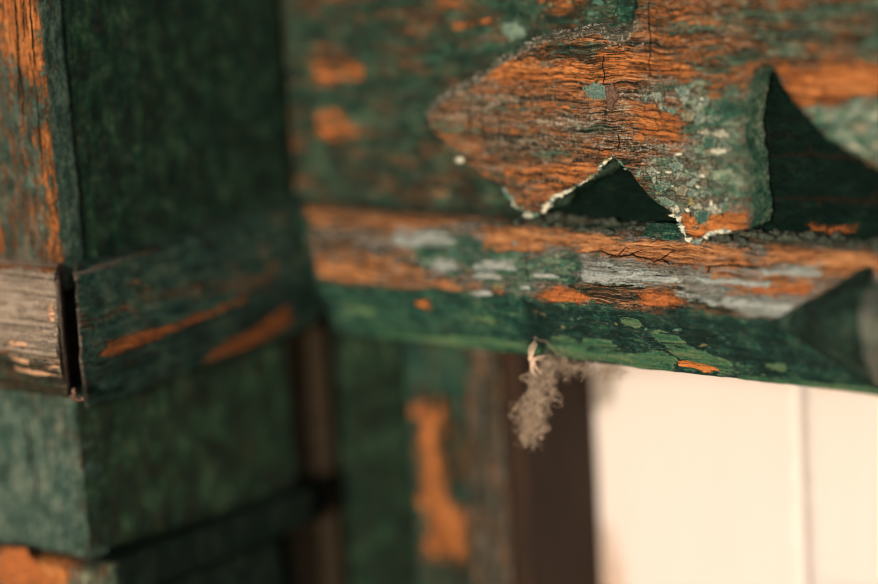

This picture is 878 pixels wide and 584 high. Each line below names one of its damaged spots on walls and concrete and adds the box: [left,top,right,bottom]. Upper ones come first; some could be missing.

crack [13,0,43,178]
peeling [808,97,878,163]
peeling [502,81,733,246]
peeling [809,222,857,235]
peeling [390,225,590,304]
crack [580,247,675,288]
peeling [632,265,824,318]
peeling [0,547,55,584]